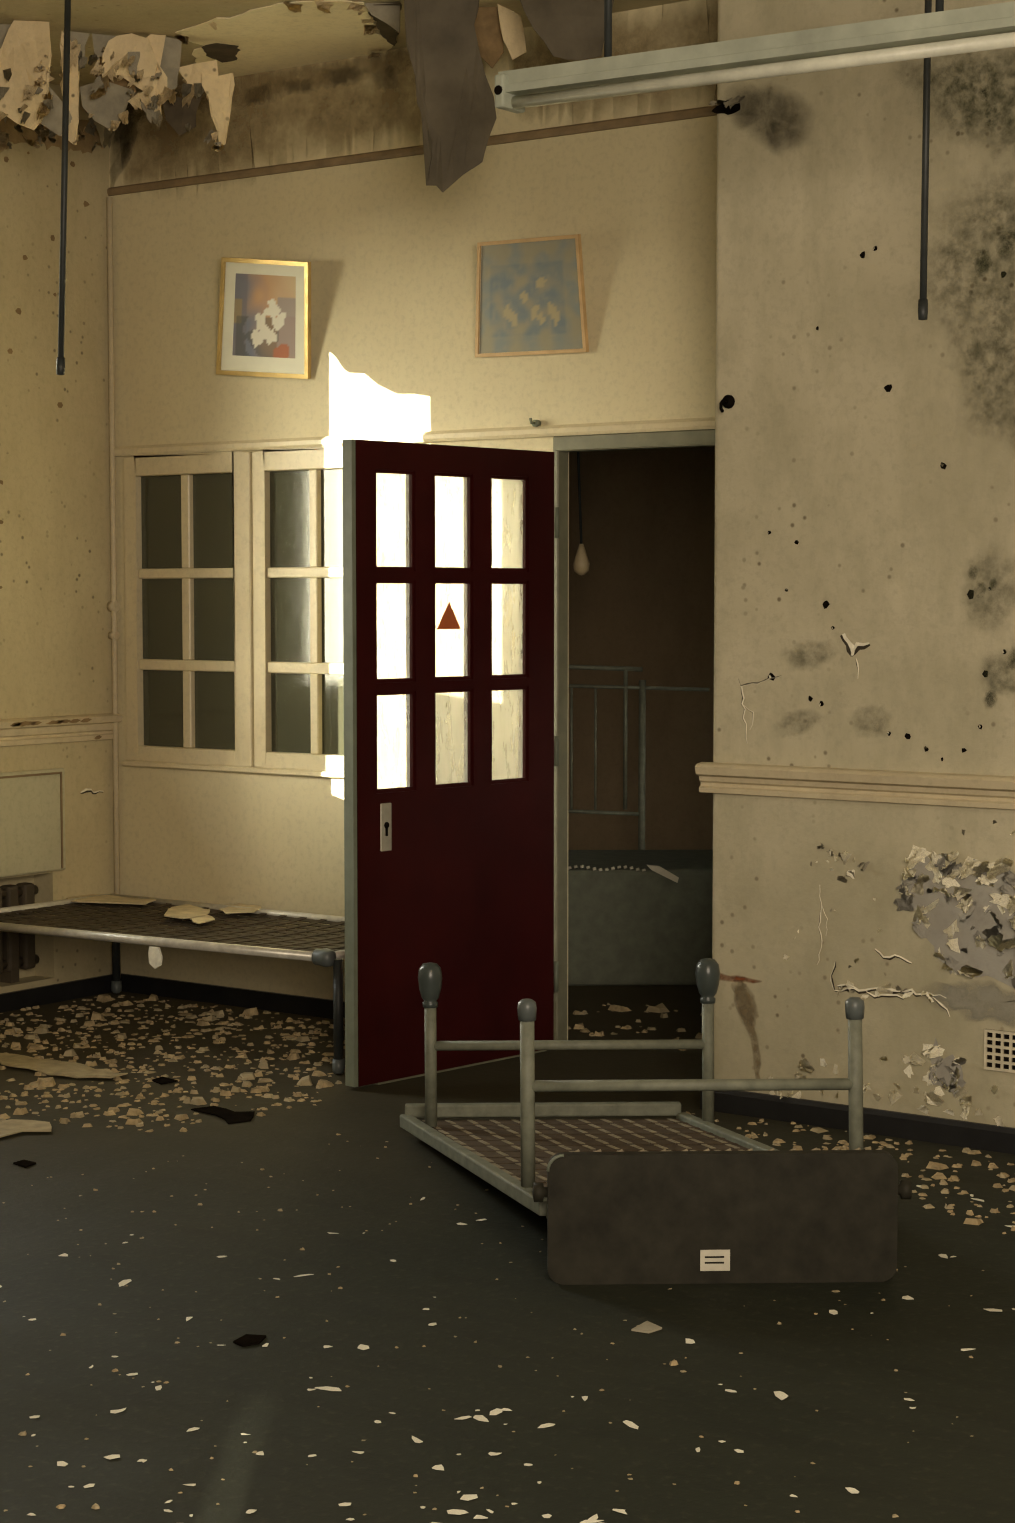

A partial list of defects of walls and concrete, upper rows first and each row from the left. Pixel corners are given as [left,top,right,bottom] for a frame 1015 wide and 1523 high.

damp [114,51,420,176]
peeling [0,0,614,192]
peeling [817,843,870,883]
peeling [893,845,1015,989]
peeling [837,981,934,1002]
peeling [921,1038,967,1097]